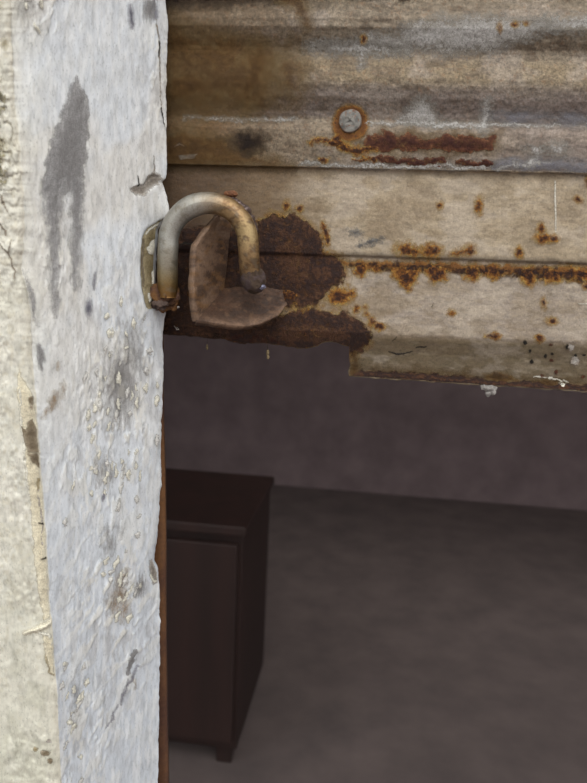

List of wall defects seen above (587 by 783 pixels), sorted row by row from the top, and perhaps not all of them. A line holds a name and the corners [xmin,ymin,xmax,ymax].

damp [42,76,90,314]
rust [308,105,497,167]
rust [150,202,587,391]